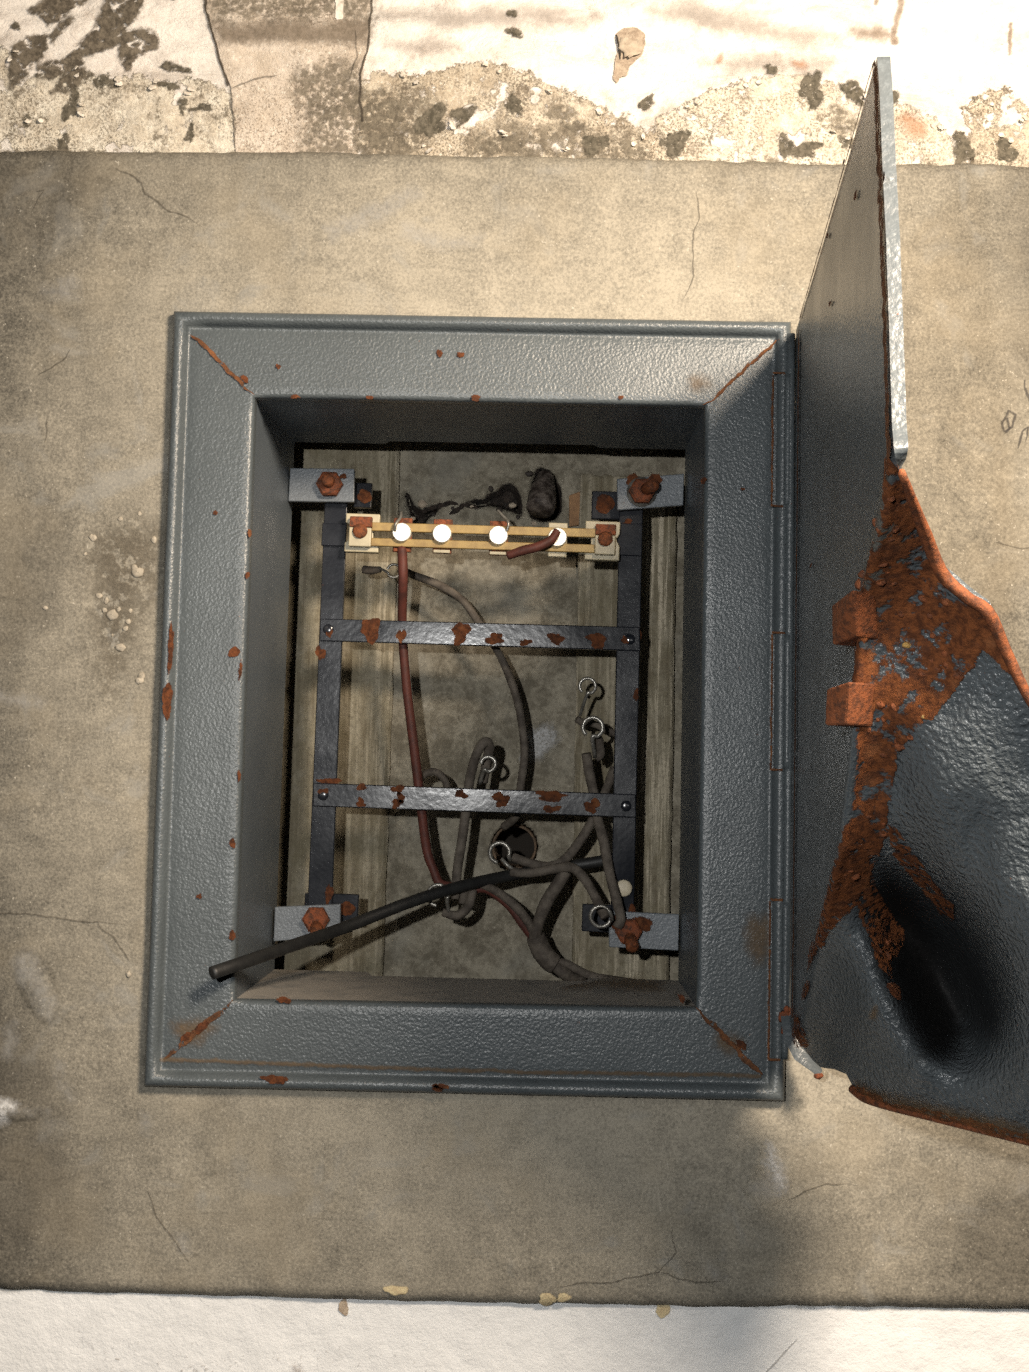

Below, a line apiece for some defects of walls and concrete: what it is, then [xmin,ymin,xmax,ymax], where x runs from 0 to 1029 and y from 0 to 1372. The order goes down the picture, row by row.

water stain [0,0,213,153]
crack [204,0,229,86]
crack [358,0,373,122]
peeling [353,59,867,165]
spalling [613,27,645,83]
peeling [893,85,1029,167]